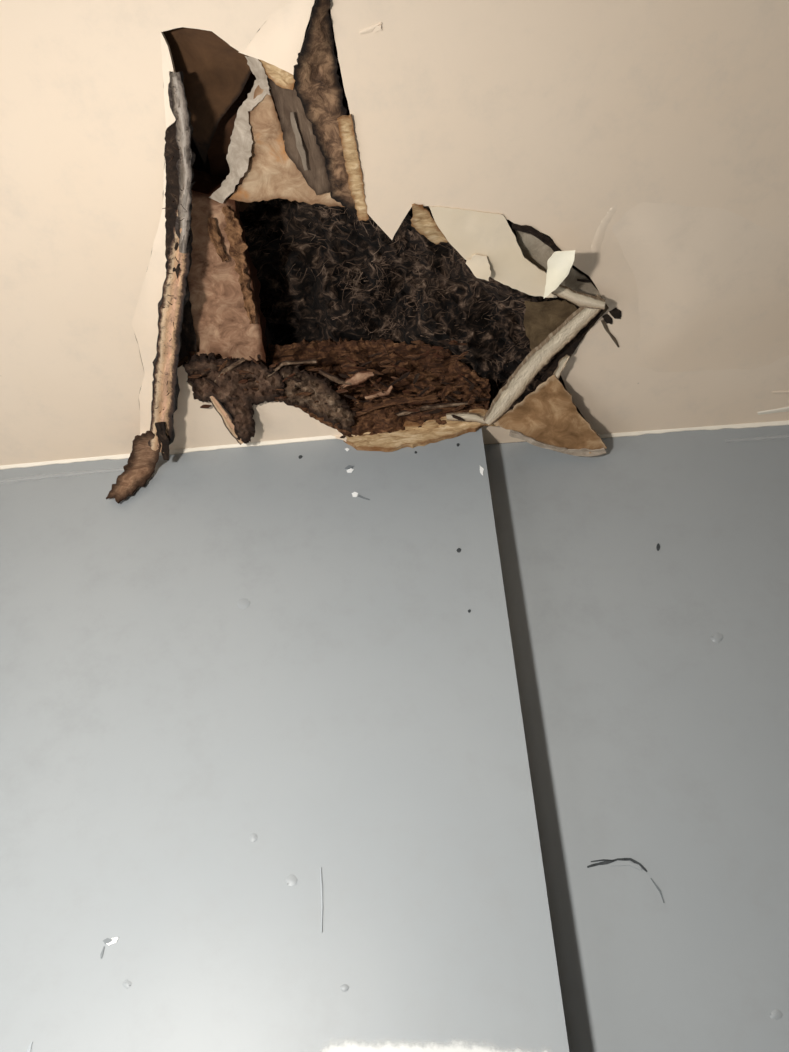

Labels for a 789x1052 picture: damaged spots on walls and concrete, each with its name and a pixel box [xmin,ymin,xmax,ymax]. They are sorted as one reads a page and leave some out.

peeling [429,206,557,298]
spalling [483,294,621,426]
crack [587,858,664,903]